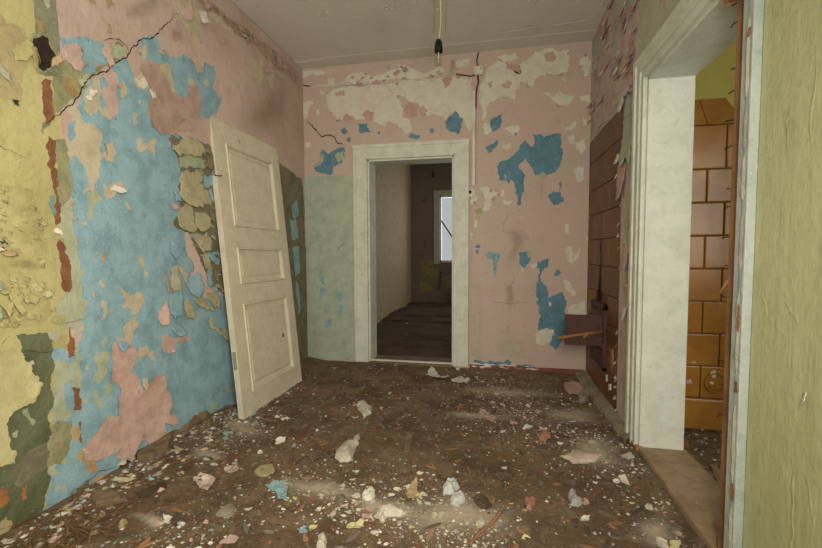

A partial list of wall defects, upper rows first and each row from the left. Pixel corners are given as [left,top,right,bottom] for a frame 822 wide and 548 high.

crack [43,17,173,127]
peeling [174,0,641,423]
peeling [0,0,237,535]
peeling [219,534,239,544]
peeling [405,477,419,498]
peeling [656,537,681,548]